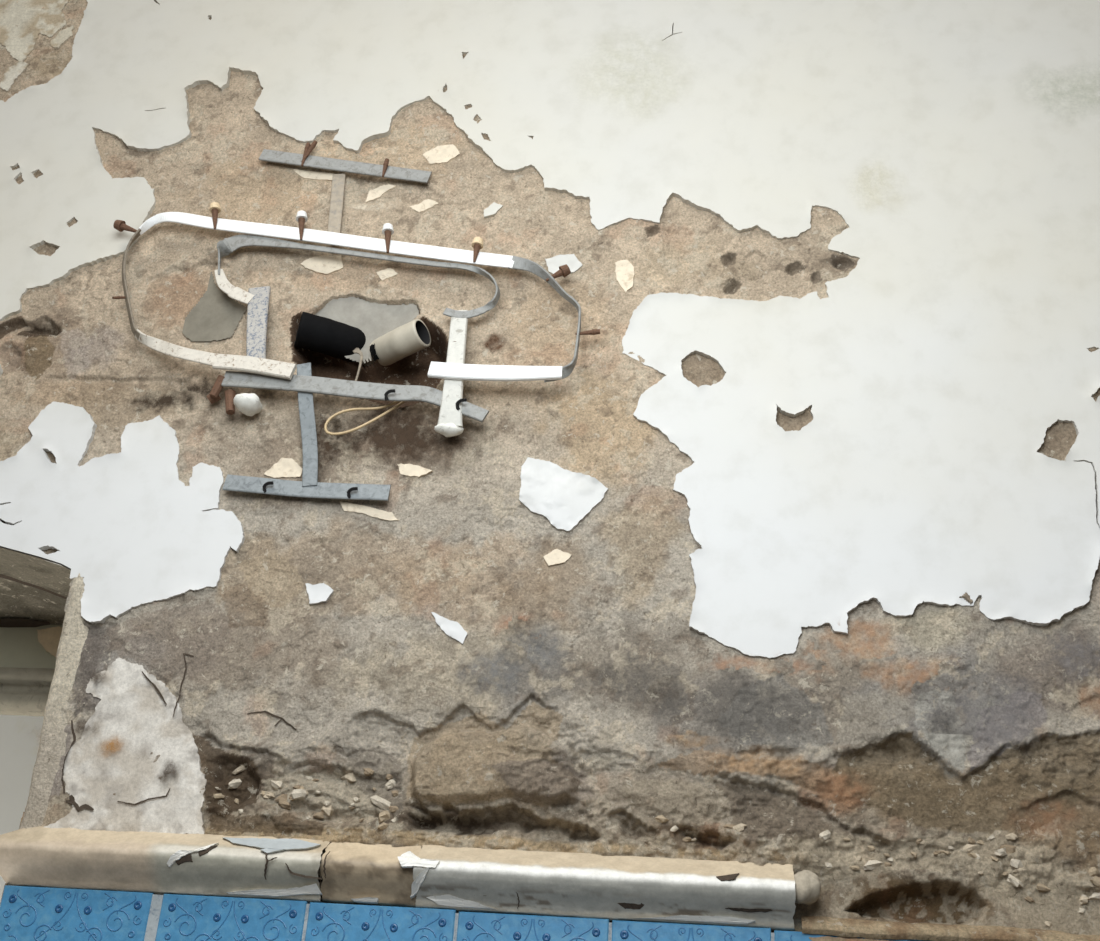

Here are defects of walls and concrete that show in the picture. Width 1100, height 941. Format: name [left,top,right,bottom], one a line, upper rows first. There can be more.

flaking render [0,0,88,102]
flaking render [93,71,332,231]
flaking render [0,99,1100,834]
crack [142,653,194,717]
crack [61,720,170,811]
peeling [167,843,219,867]
crack [264,851,330,880]
spalling [202,691,1100,935]